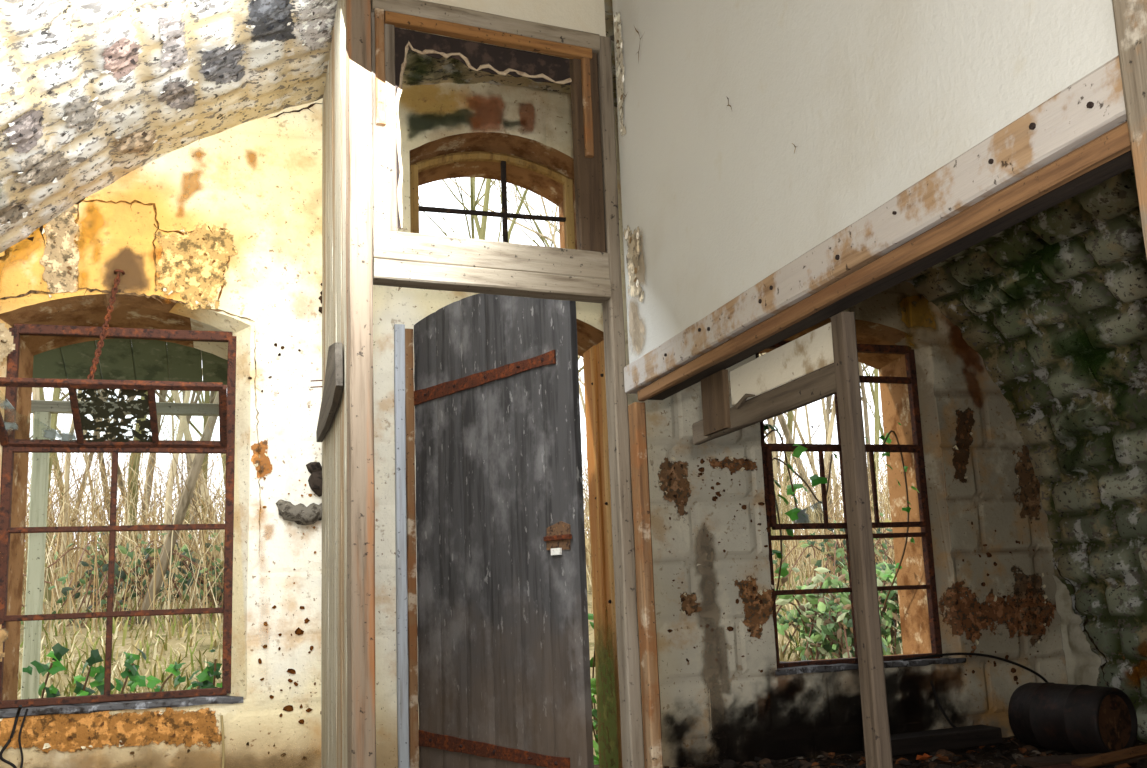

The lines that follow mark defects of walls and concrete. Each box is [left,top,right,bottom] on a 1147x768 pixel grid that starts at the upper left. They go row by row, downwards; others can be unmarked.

spalling [40,206,80,298]
spalling [155,223,237,310]
peeling [251,440,272,480]
peeling [657,456,758,520]
peeling [952,408,975,483]
peeling [1012,445,1041,524]
damp [696,526,730,733]
peeling [667,576,774,644]
peeling [939,540,1056,675]
spalling [0,707,225,767]
damp [665,715,695,767]